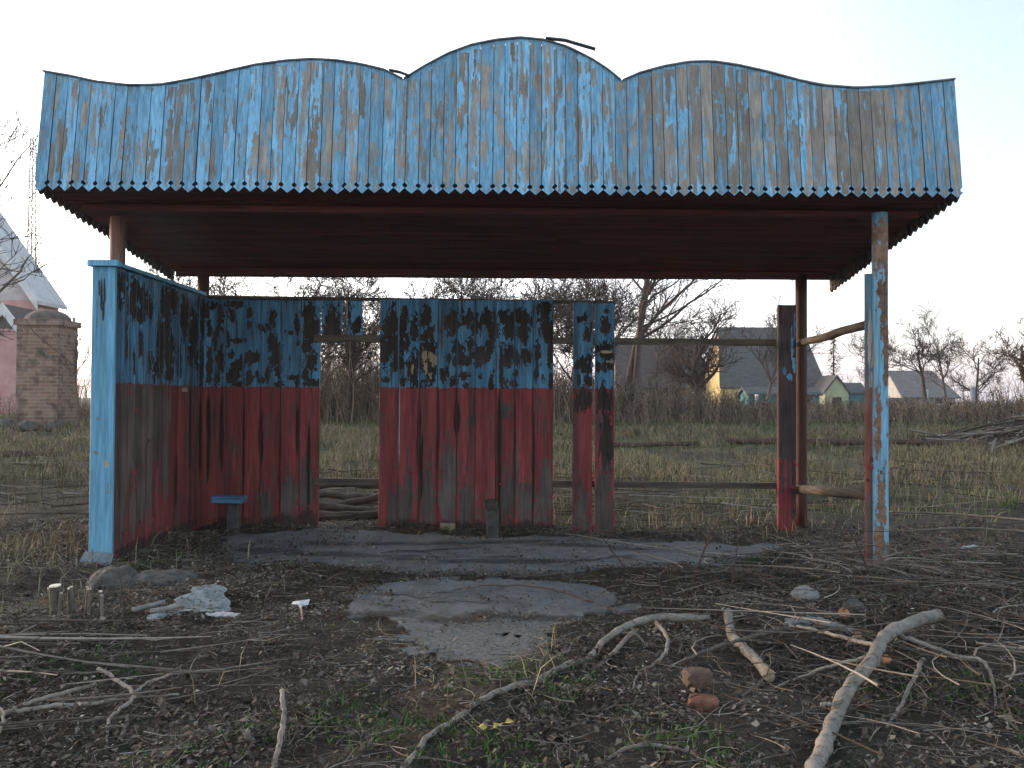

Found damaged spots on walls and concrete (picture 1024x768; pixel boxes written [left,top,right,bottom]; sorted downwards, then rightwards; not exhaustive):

peeling [35,41,961,196]
peeling [114,271,361,559]
peeling [380,301,553,528]
peeling [573,305,616,531]
peeling [780,398,799,528]
rust [871,216,889,559]